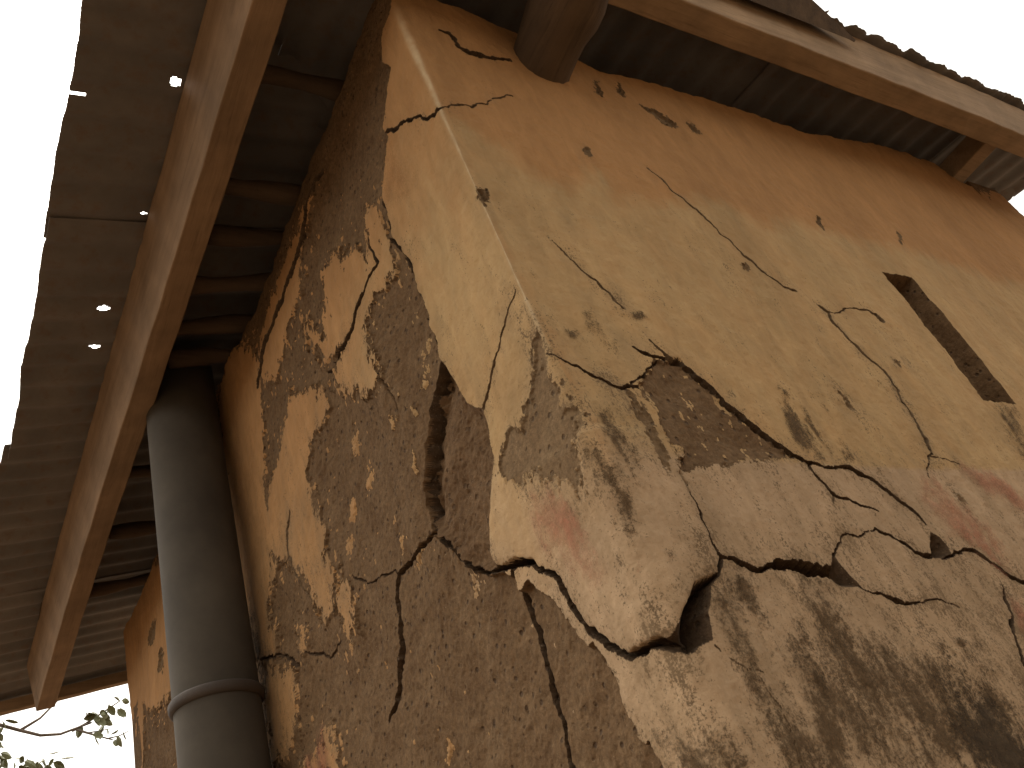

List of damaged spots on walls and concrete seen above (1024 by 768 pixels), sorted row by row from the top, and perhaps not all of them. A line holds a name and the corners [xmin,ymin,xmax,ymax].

crack [438,29,513,62]
crack [385,94,513,134]
crack [286,510,316,609]
spalling [216,0,664,768]
crack [328,167,803,768]
spalling [625,356,795,473]
crack [546,339,1024,666]
crack [818,305,960,478]
crack [257,641,341,672]
damp [691,562,1024,768]
spalling [142,691,178,768]
damp [651,724,752,768]